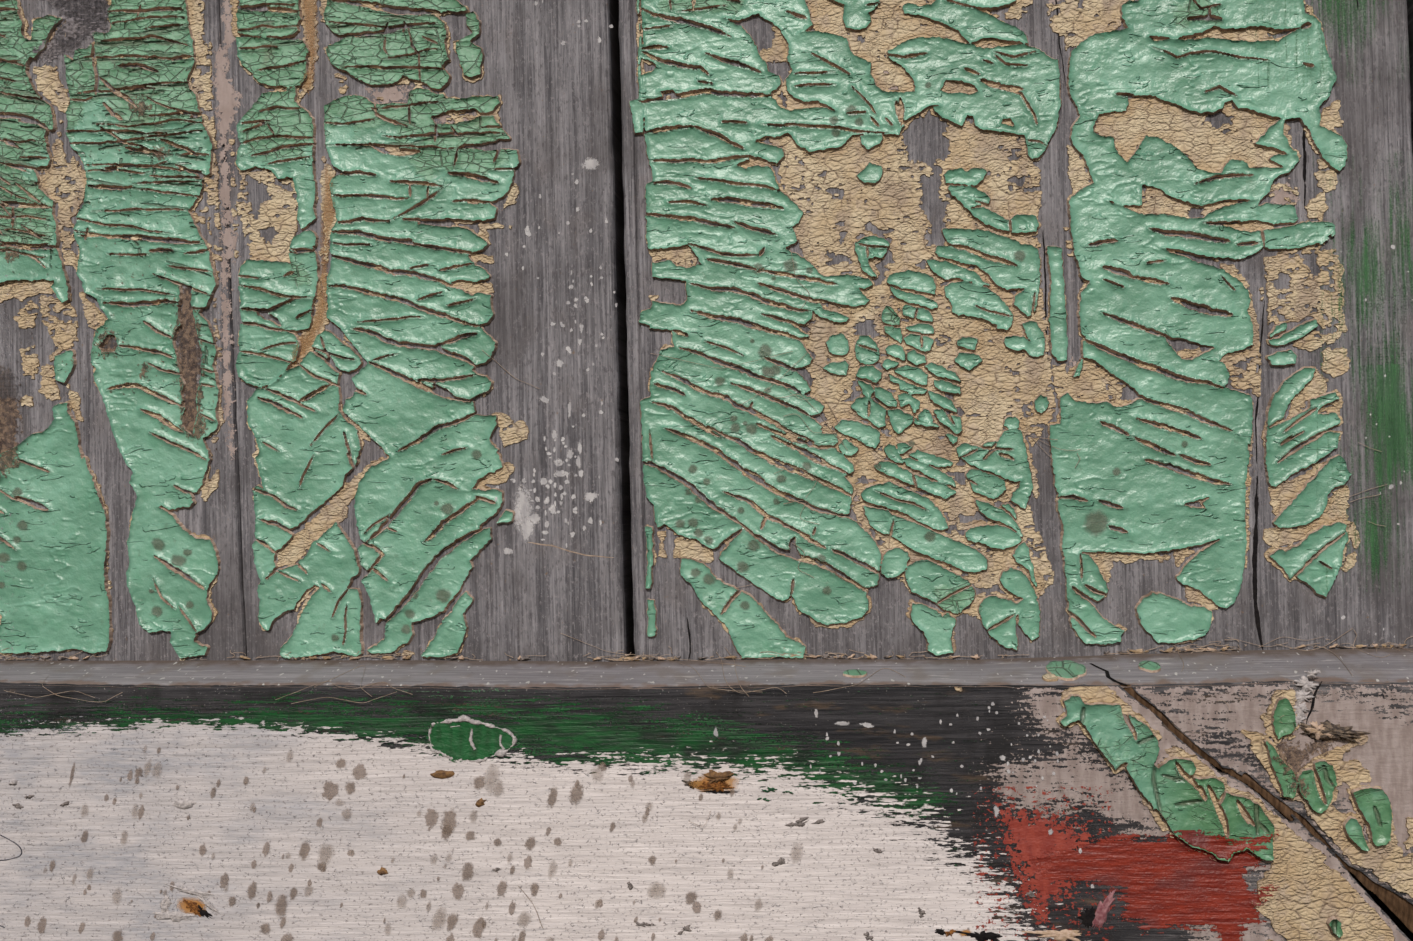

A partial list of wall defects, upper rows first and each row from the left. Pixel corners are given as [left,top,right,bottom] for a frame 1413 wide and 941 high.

peeling [0,0,529,661]
peeling [629,0,1361,659]
peeling [975,660,1413,941]
crack [1089,663,1413,941]